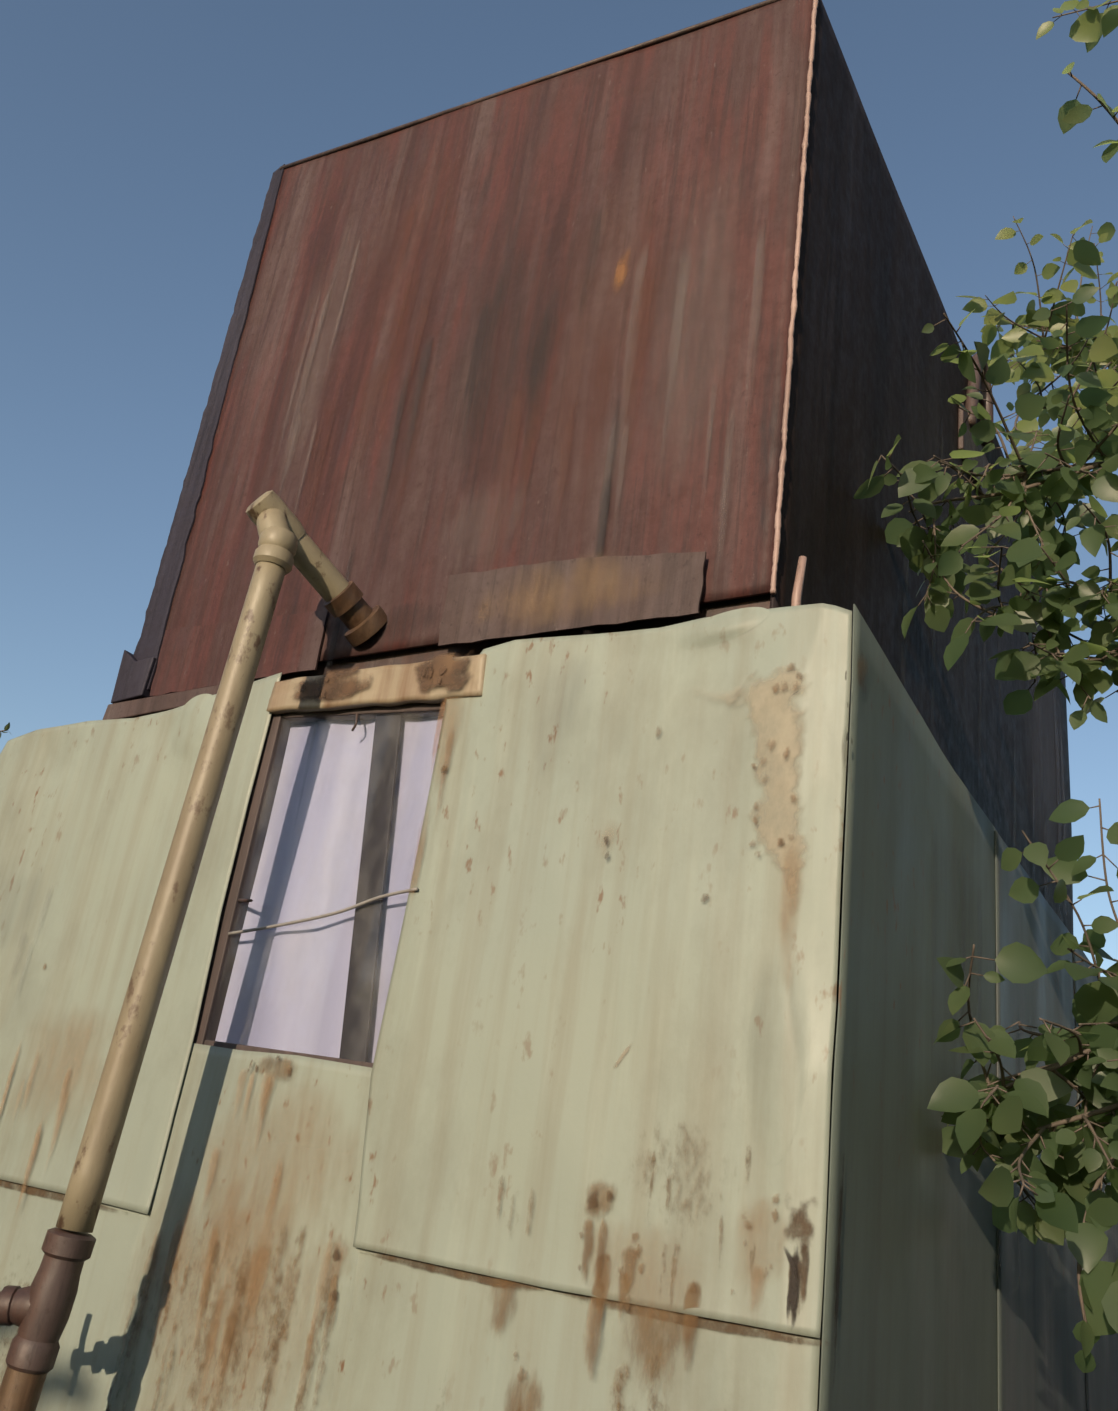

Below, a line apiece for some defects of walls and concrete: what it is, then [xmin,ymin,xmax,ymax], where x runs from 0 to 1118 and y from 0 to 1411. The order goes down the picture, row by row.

corrosion [294,666,369,700]
corrosion [415,654,469,691]
corrosion [328,1250,339,1310]
corrosion [579,1187,802,1360]
corrosion [788,1209,812,1308]